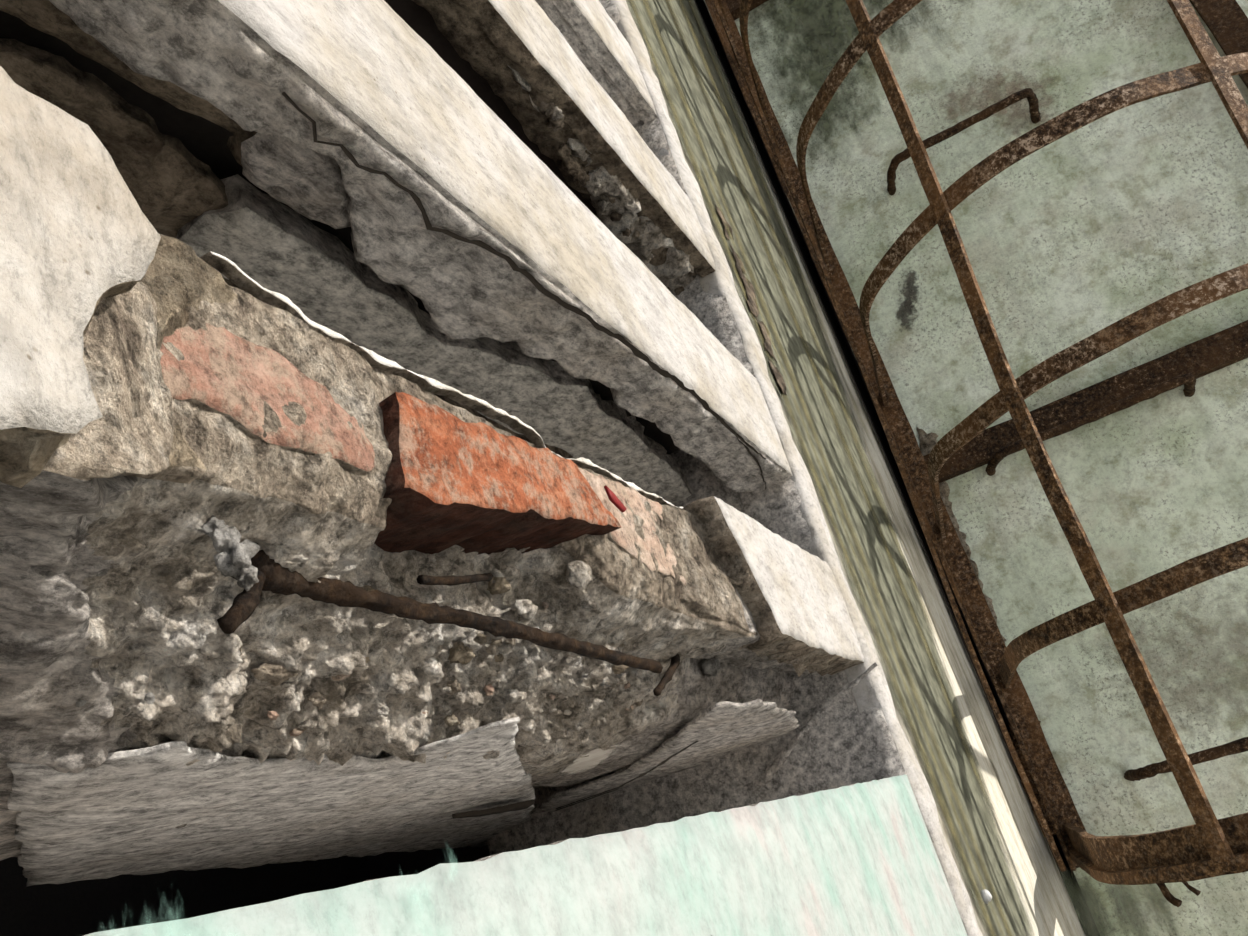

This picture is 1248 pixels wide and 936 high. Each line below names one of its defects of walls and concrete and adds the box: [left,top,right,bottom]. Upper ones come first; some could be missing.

spalling [0,0,819,886]
crack [282,92,766,489]